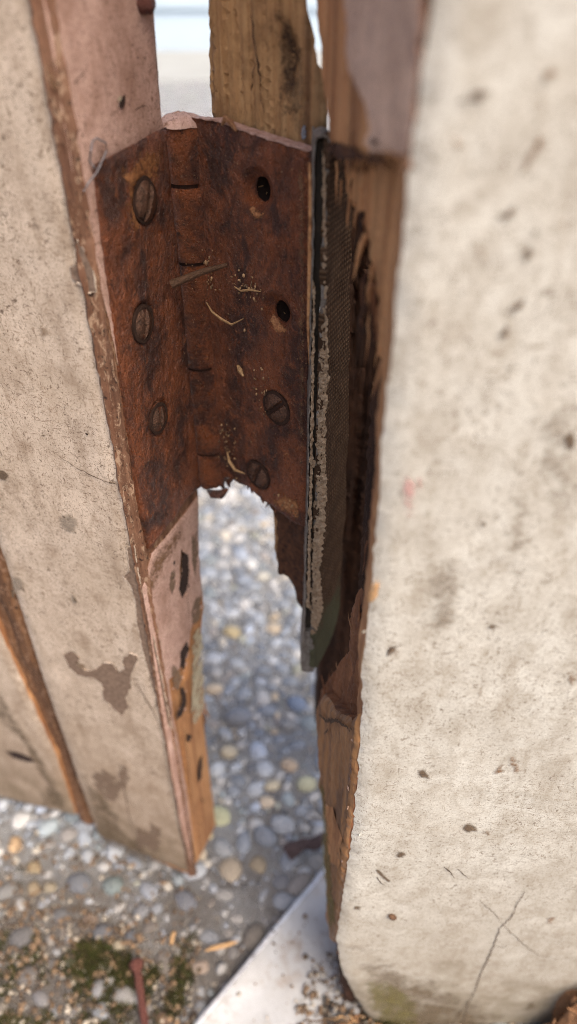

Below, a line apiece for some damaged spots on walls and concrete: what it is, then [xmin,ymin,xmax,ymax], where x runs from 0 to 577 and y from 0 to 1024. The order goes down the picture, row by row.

rust [122,151,160,229]
rust [270,315,287,333]
rust [207,488,229,499]
spalling [0,480,343,1024]
crack [452,892,565,1024]